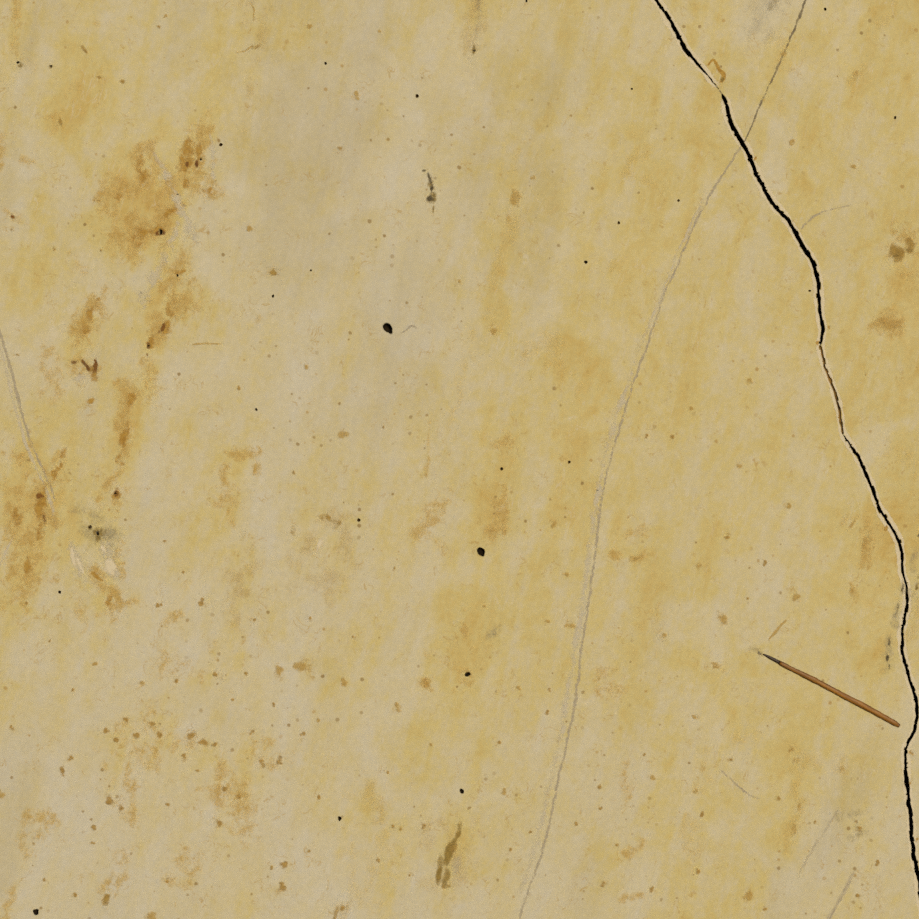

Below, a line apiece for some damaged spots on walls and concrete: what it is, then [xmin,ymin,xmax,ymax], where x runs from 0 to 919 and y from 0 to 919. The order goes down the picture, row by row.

rust [96,142,176,264]
rust [165,125,216,199]
crack [519,0,919,918]